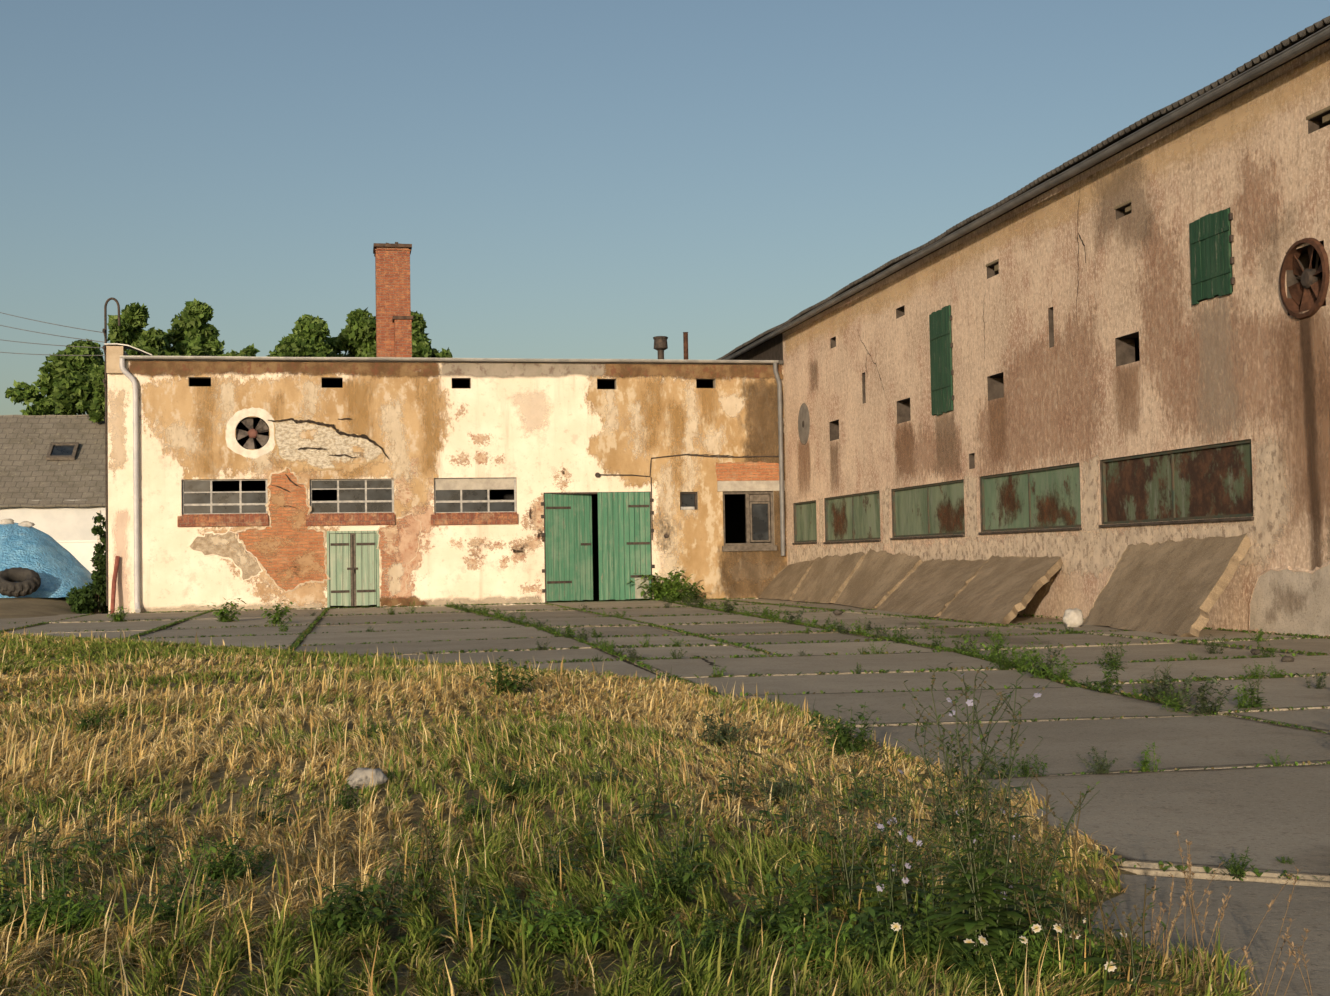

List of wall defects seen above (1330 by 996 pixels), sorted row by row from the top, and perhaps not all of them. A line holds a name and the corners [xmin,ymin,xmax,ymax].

peeling [108,373,571,608]
leakage [129,361,787,599]
rust [831,498,847,540]
rust [999,481,1020,519]
rust [1035,494,1076,527]